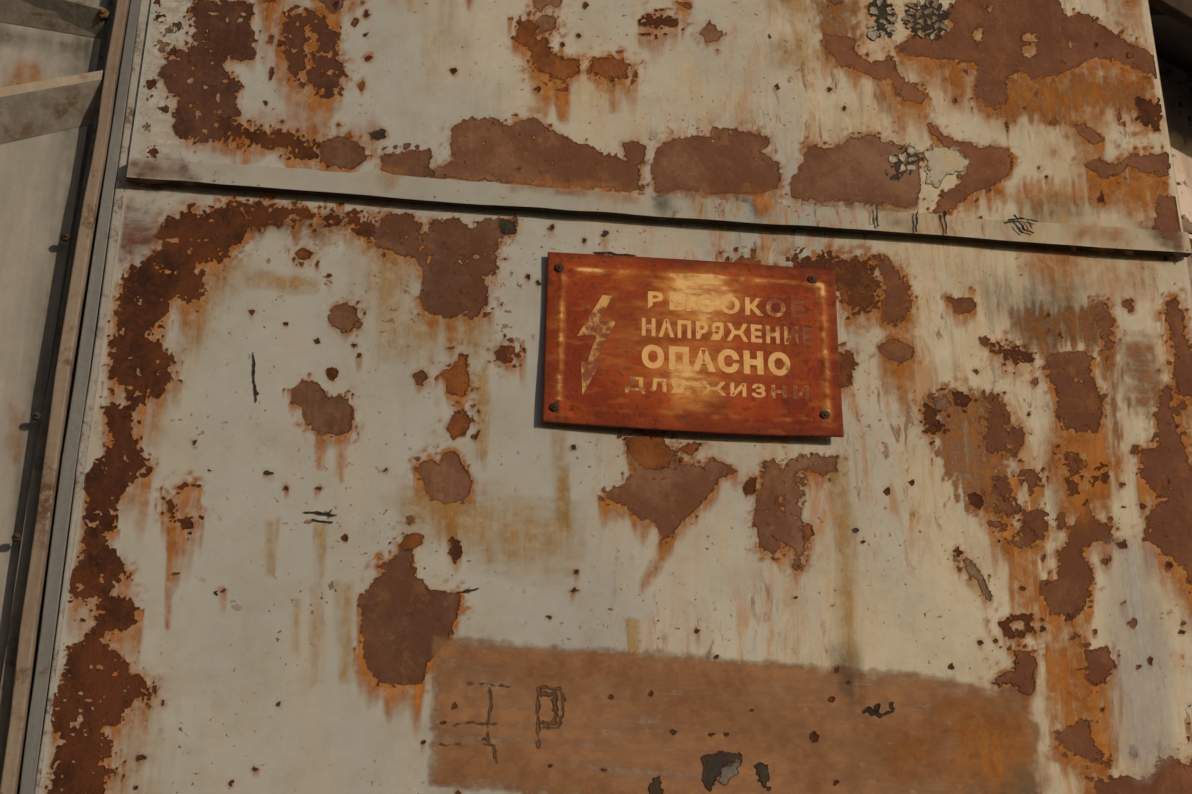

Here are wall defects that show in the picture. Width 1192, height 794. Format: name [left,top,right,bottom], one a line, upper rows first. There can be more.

peeling [139,0,261,159]
peeling [276,0,1157,216]
peeling [367,211,518,329]
corrosion [716,245,890,327]
peeling [283,373,359,446]
corrosion [838,342,859,391]
corrosion [877,320,915,398]
corrosion [1157,289,1192,429]
corrosion [41,193,379,794]
peeling [598,437,738,547]
corrosion [919,250,1140,794]
peeling [354,546,470,720]